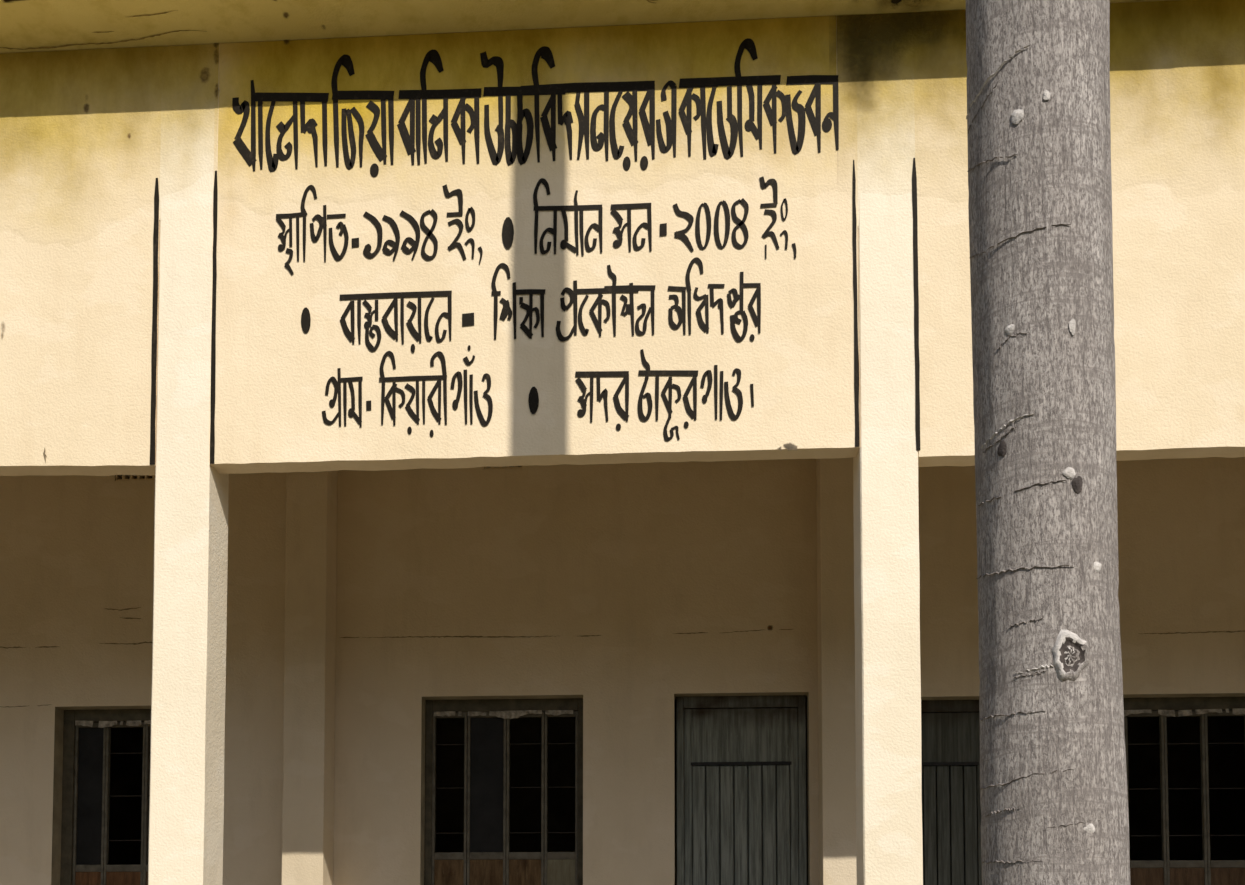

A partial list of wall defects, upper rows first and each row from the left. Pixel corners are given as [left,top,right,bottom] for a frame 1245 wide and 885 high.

leakage [0,0,969,247]
leakage [1110,0,1245,197]
crack [100,607,153,645]
crack [340,633,551,641]